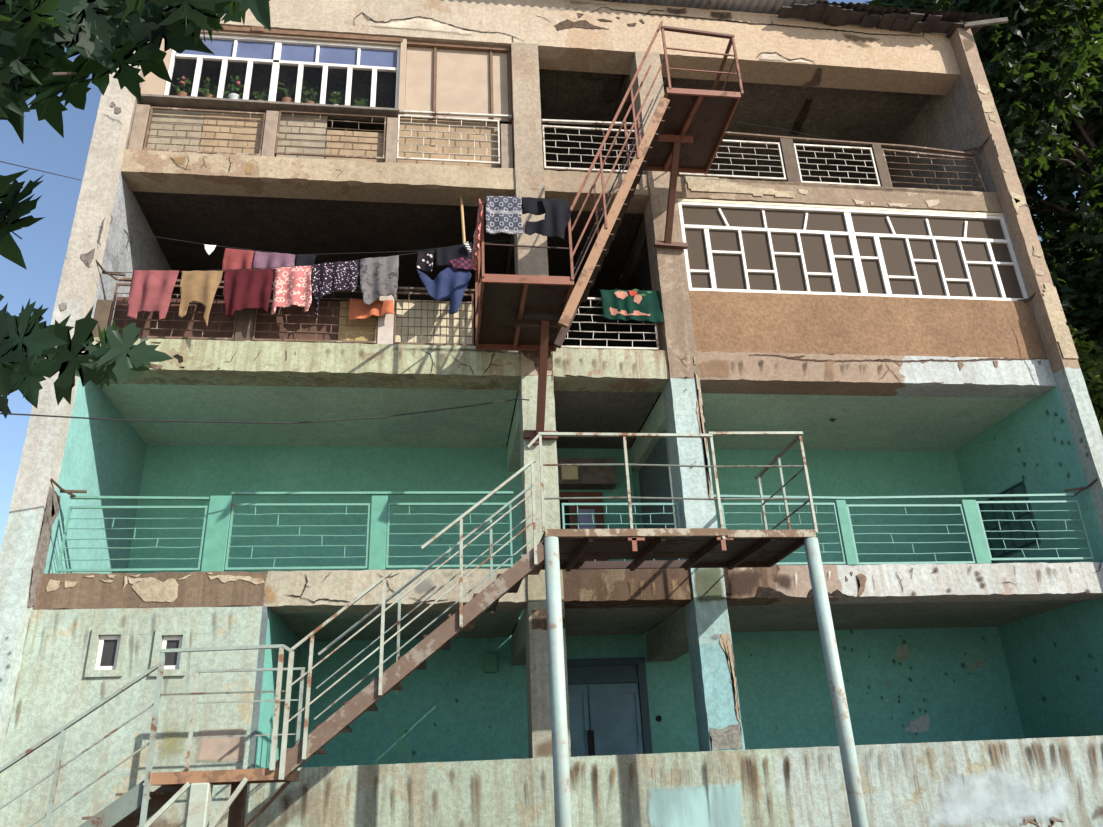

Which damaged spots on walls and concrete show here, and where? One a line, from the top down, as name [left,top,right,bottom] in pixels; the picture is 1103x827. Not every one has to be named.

crack [354,12,520,42]
flaking render [554,13,645,31]
spalling [28,486,116,607]
peeling [130,574,191,603]
peeling [208,573,265,585]
crack [288,574,350,604]
peeling [696,568,740,601]
spalling [754,587,813,599]
peeling [827,572,867,598]
flaking render [710,633,743,751]
corrosion [572,762,616,809]
corrosion [743,756,773,817]